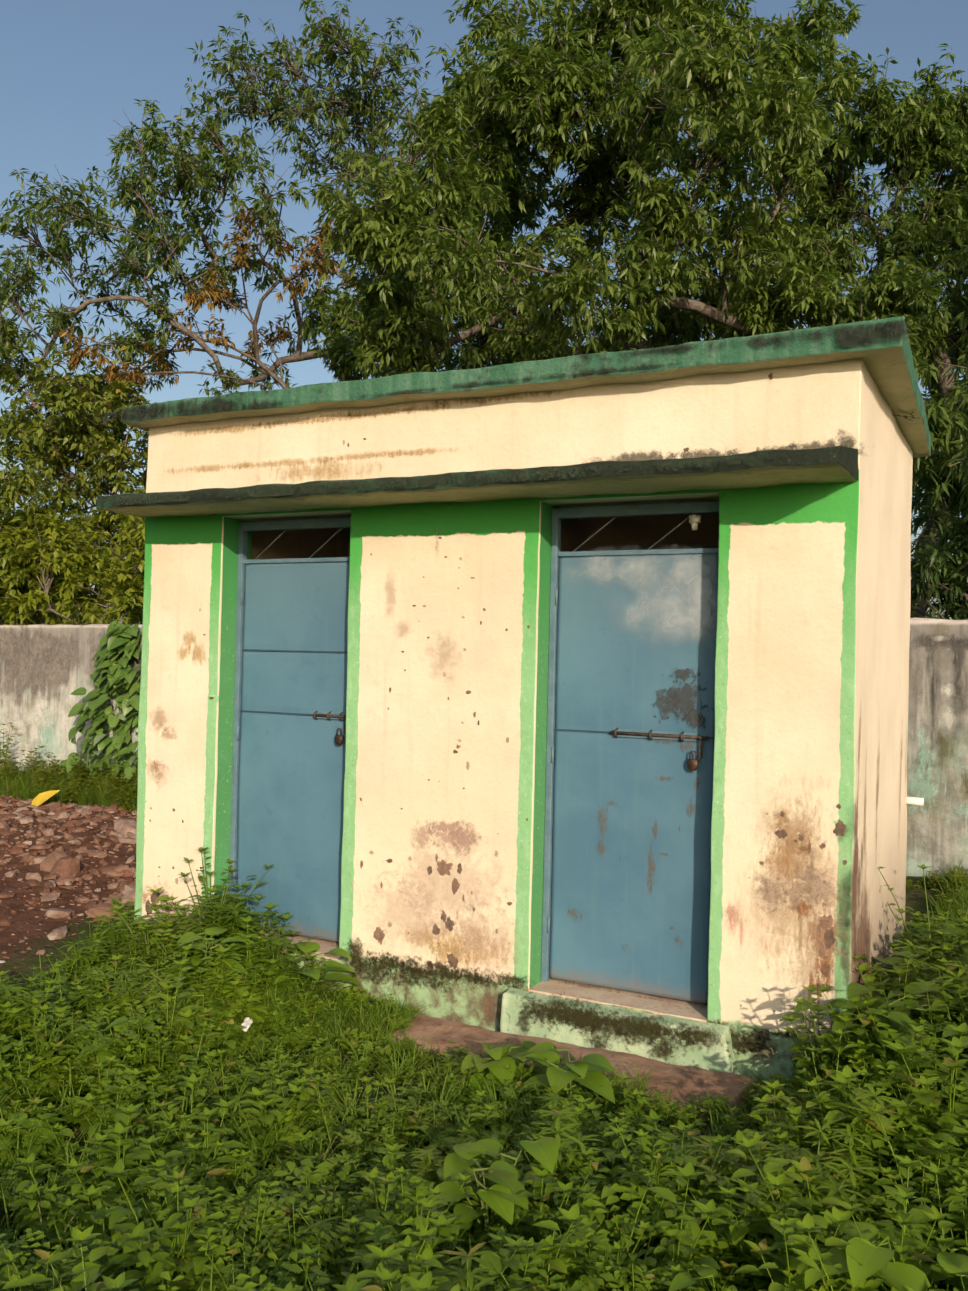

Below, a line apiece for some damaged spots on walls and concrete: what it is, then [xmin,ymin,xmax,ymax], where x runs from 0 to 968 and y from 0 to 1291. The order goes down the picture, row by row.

mould [749,320,907,348]
damp [551,343,695,378]
damp [453,377,531,388]
damp [109,432,863,505]
damp [0,631,142,721]
damp [909,634,968,739]
damp [474,990,502,1019]